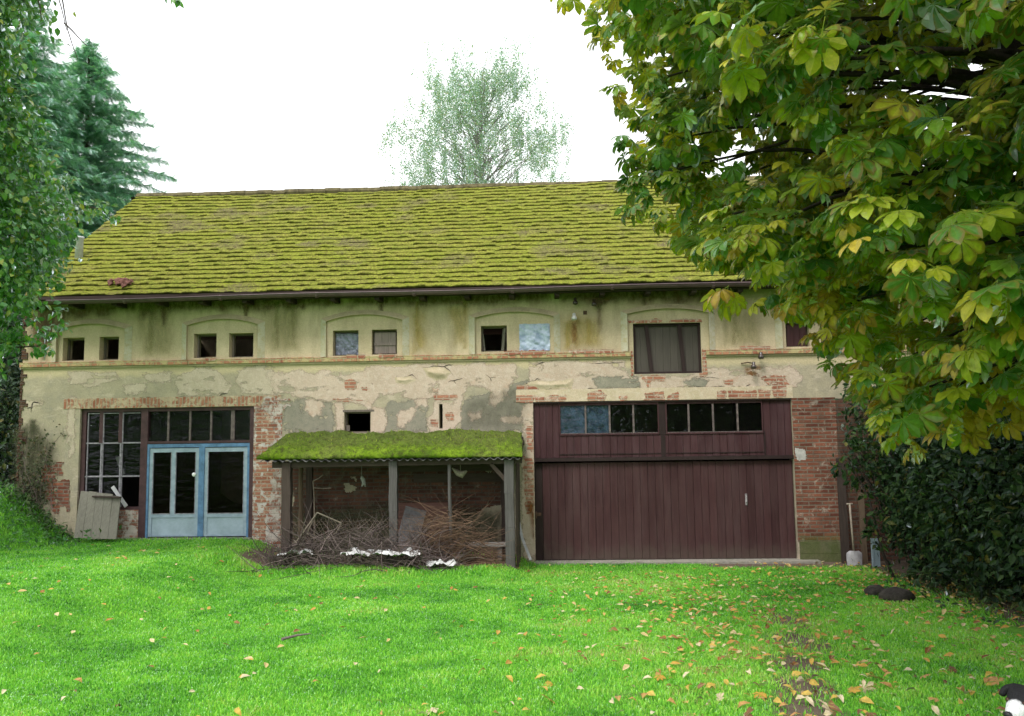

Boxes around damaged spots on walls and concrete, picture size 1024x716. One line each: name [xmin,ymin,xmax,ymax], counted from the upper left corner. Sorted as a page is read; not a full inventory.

leakage [32,299,333,349]
leakage [350,294,547,316]
leakage [563,290,716,311]
peeling [41,349,803,559]